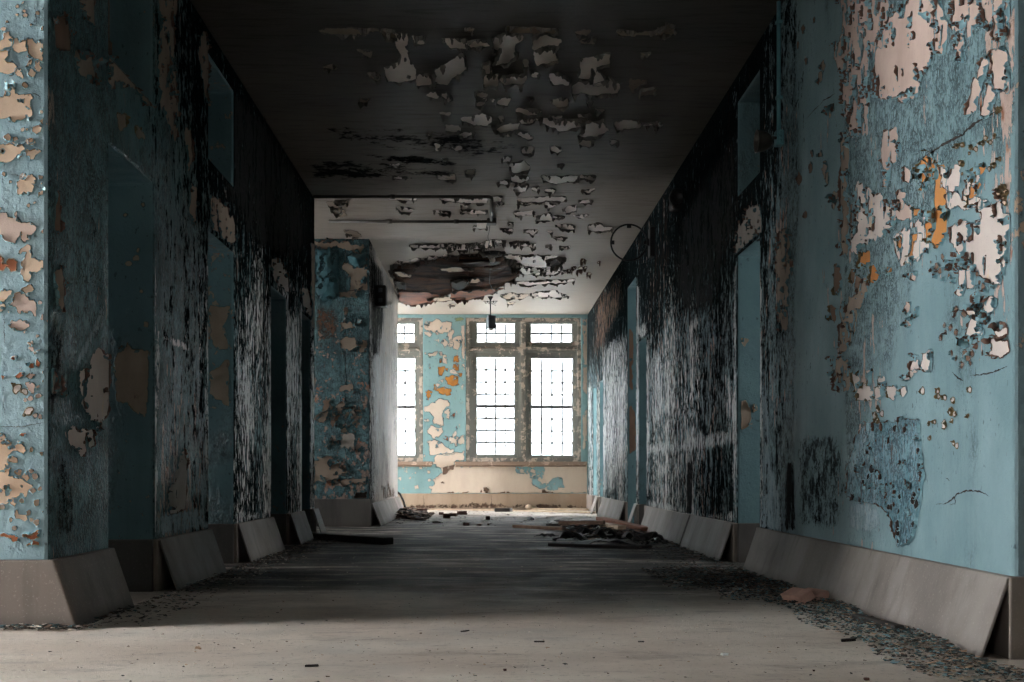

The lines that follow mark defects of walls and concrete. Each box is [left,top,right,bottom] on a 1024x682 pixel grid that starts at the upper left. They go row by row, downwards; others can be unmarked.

peeling [0,1,72,420]
peeling [319,26,663,307]
peeling [795,0,1011,548]
peeling [0,432,44,547]
peeling [64,342,151,457]
leakage [155,310,208,537]
leakage [235,297,271,521]
peeling [314,383,366,488]
peeling [398,295,587,494]
leakage [594,266,736,521]
crack [944,478,988,504]